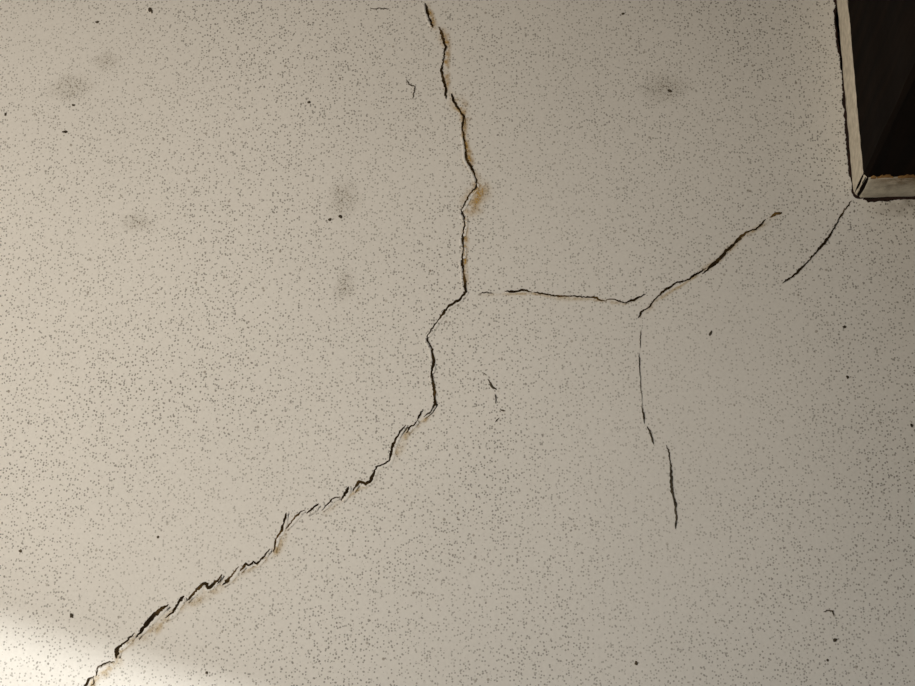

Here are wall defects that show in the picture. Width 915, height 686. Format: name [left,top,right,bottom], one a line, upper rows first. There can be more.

crack [84,3,782,686]
crack [783,0,915,283]